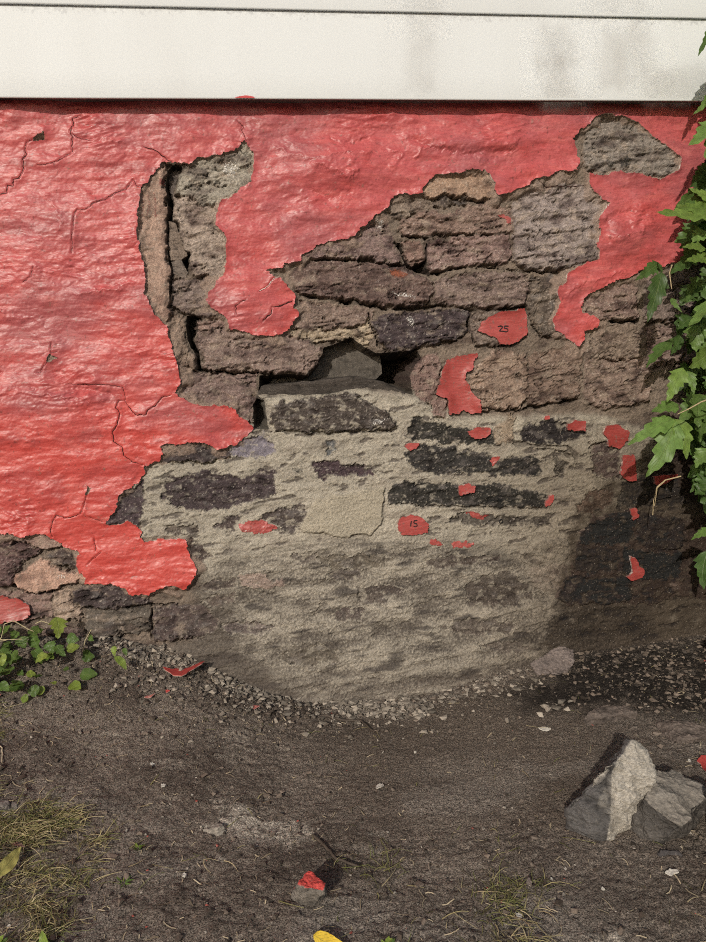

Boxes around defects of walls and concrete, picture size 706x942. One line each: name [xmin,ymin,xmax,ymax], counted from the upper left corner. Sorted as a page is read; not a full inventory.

crack [1,116,88,194]
crack [78,384,170,465]
spalling [0,114,706,704]